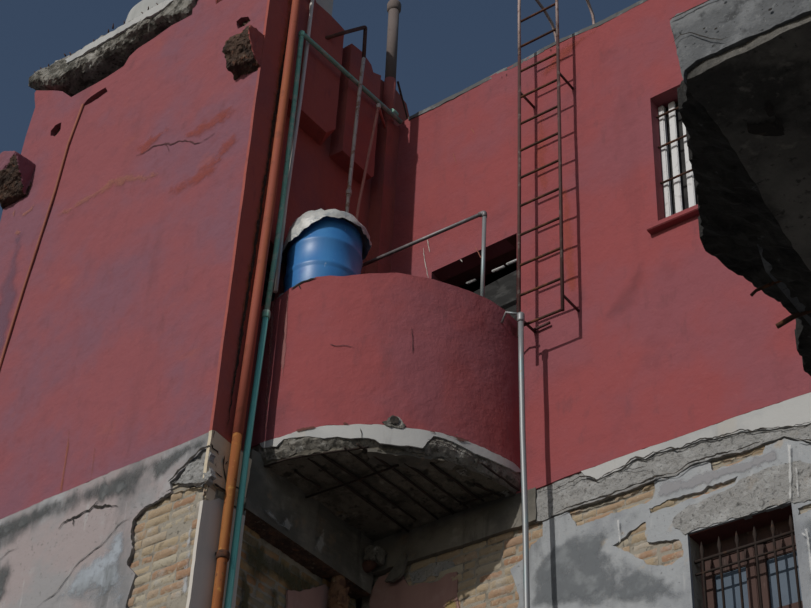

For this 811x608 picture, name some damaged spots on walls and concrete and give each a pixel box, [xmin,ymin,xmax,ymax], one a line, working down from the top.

crack [141,134,213,154]
spalling [775,310,811,329]
water stain [0,568,9,598]
crack [58,501,117,529]
flaking render [41,445,225,608]
flaking render [235,525,331,608]
spalling [264,443,520,542]
flaking render [369,523,543,608]
water stain [534,534,671,603]
flaking render [616,523,684,566]
flaking render [569,442,776,526]